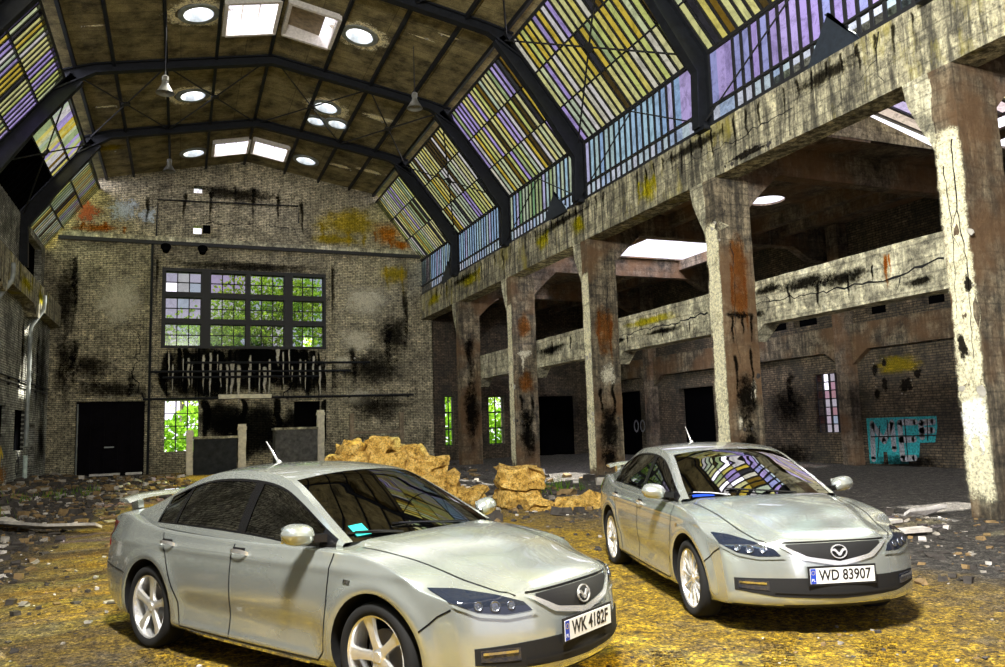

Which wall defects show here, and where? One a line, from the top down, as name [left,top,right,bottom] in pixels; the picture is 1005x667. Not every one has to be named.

leakage [795,44,861,100]
leakage [636,102,761,191]
leakage [182,186,283,228]
crack [730,139,974,363]
crack [604,287,708,345]